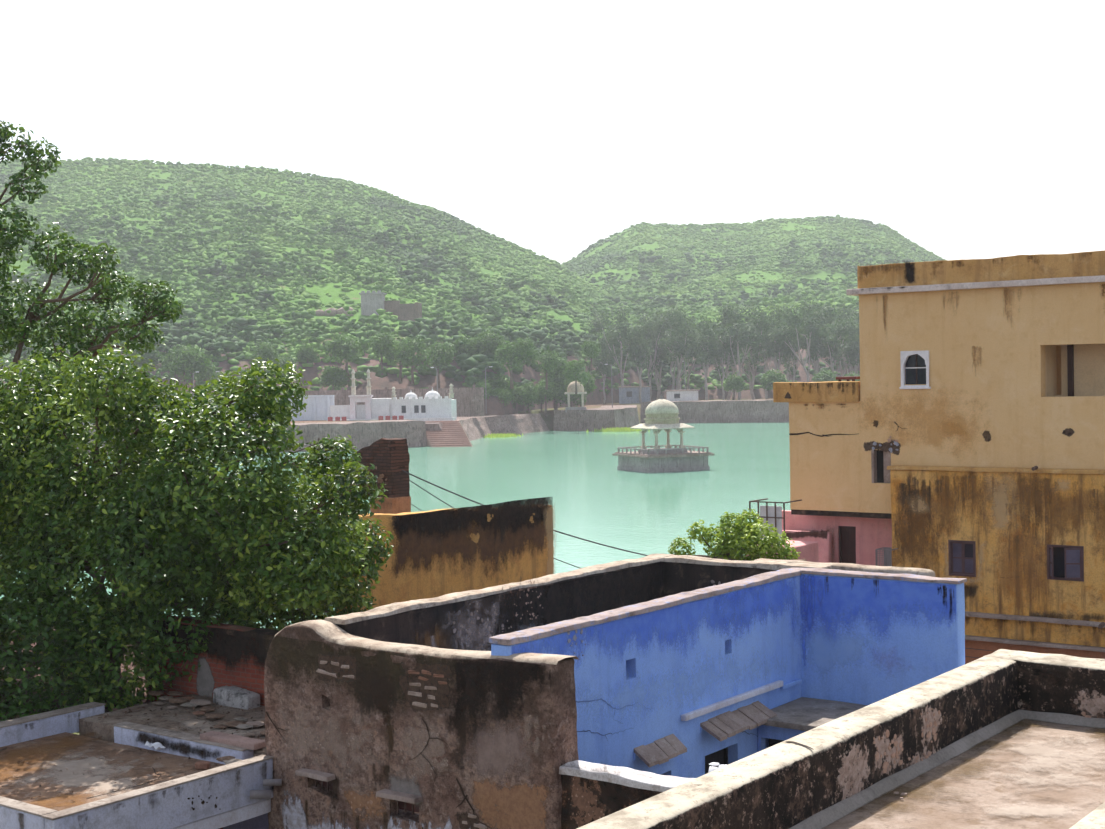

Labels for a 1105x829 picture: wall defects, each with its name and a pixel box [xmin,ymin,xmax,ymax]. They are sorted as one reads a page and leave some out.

leakage [861,261,915,290]
crack [789,430,855,438]
leakage [392,497,553,576]
leakage [899,476,975,569]
leakage [1023,612,1105,631]
spalling [398,662,452,712]
crack [576,699,653,741]
peeling [1073,689,1105,719]
peeling [471,718,530,778]
spalling [456,812,487,829]